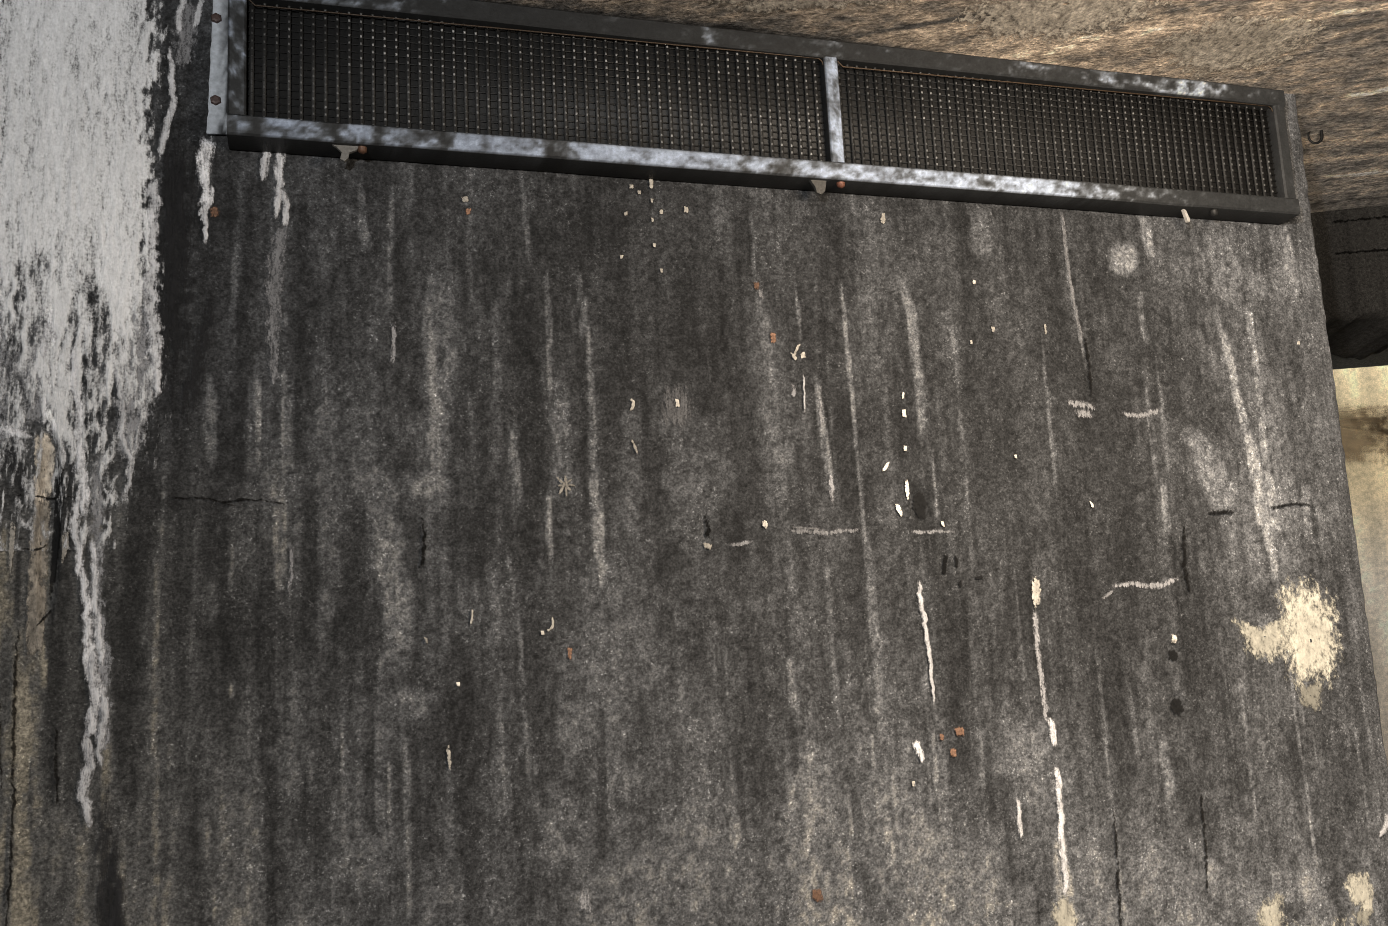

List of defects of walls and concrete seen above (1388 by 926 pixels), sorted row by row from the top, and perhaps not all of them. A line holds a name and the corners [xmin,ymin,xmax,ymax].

leakage [0,0,216,926]
leakage [1338,405,1388,462]
crack [0,610,51,926]
crack [52,730,60,804]